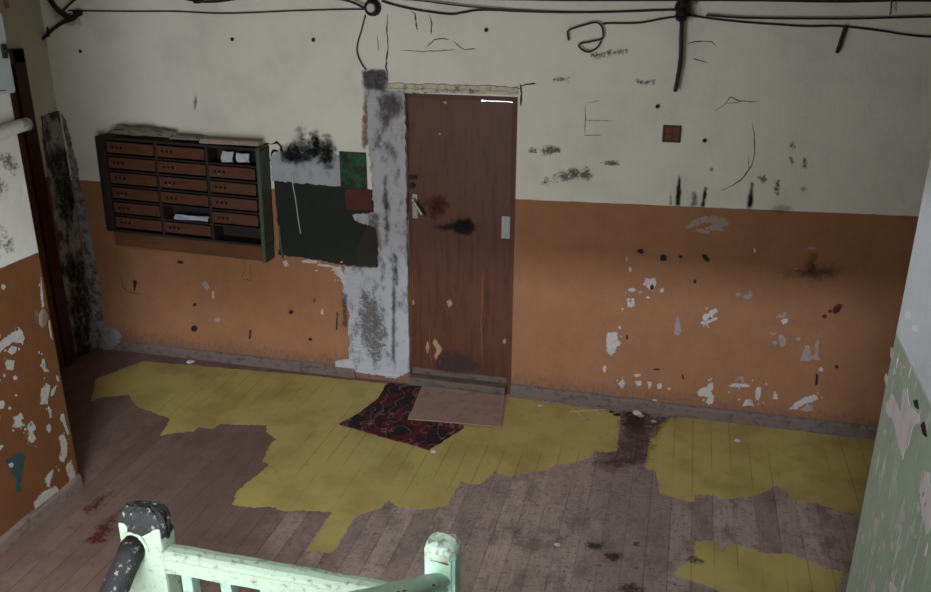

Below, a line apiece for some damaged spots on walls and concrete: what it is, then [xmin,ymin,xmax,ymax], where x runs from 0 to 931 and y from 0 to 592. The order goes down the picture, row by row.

peeling [0,326,25,381]
peeling [0,351,76,509]
spalling [35,280,52,339]
peeling [605,326,628,356]
peeling [622,257,664,310]
peeling [617,374,670,401]
peeling [697,378,715,405]
peeling [700,307,718,328]
peeling [728,376,778,407]
peeling [769,312,823,412]
peeling [884,348,927,460]
peeling [861,470,931,592]